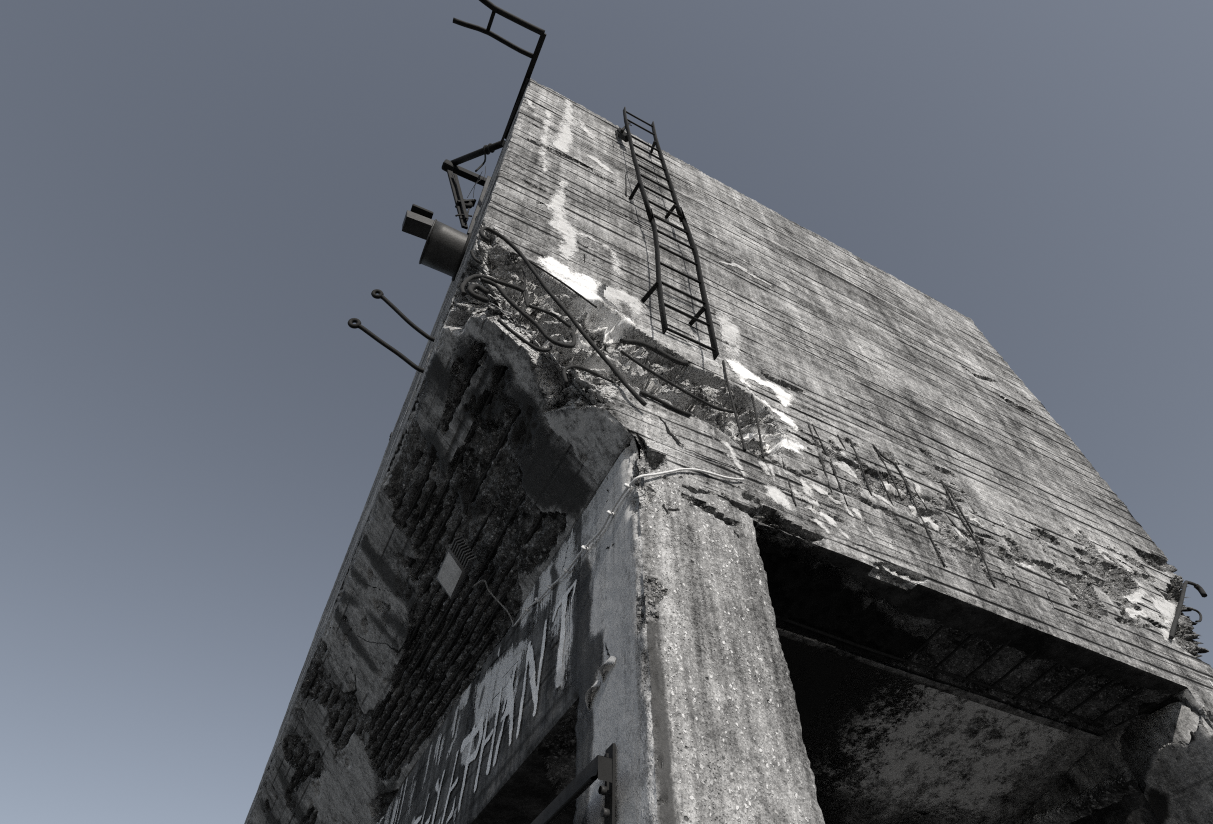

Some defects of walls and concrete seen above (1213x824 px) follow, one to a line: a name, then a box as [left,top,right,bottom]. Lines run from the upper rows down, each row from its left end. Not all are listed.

damp [527,99,595,172]
damp [538,181,658,394]
spalling [262,220,1213,824]